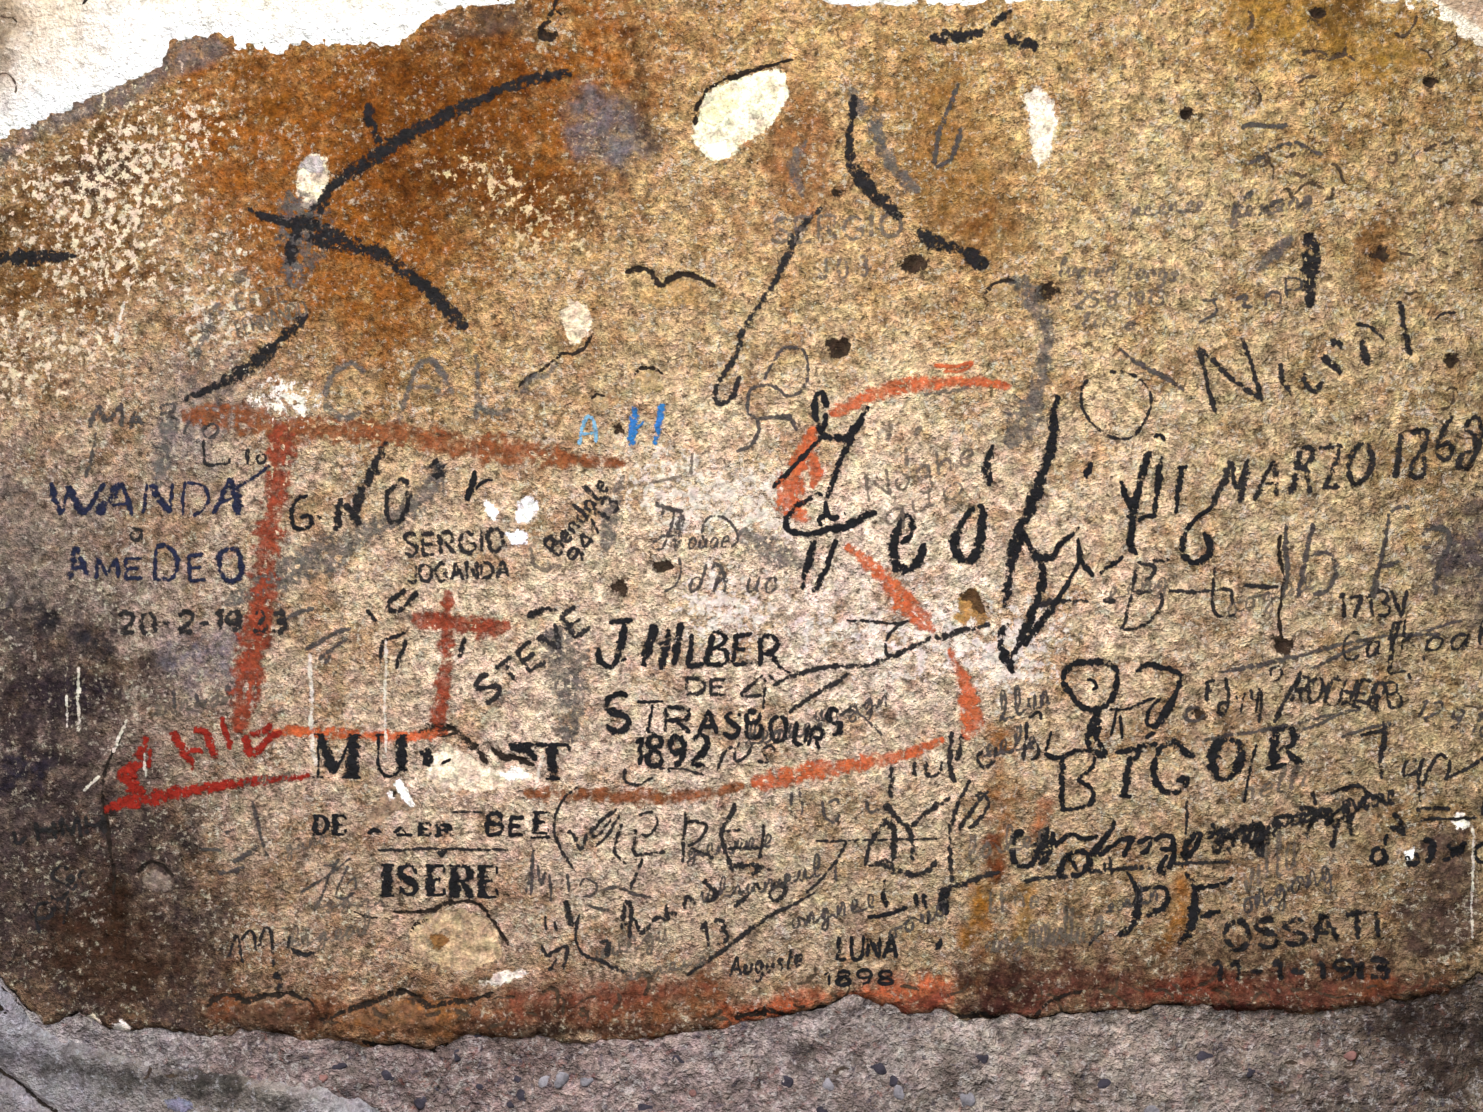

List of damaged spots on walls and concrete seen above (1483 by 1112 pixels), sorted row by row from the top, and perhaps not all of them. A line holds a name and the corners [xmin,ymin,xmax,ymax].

damp [0,0,641,439]
damp [1431,500,1483,604]
spalling [87,1013,131,1032]
spalling [164,1097,193,1112]